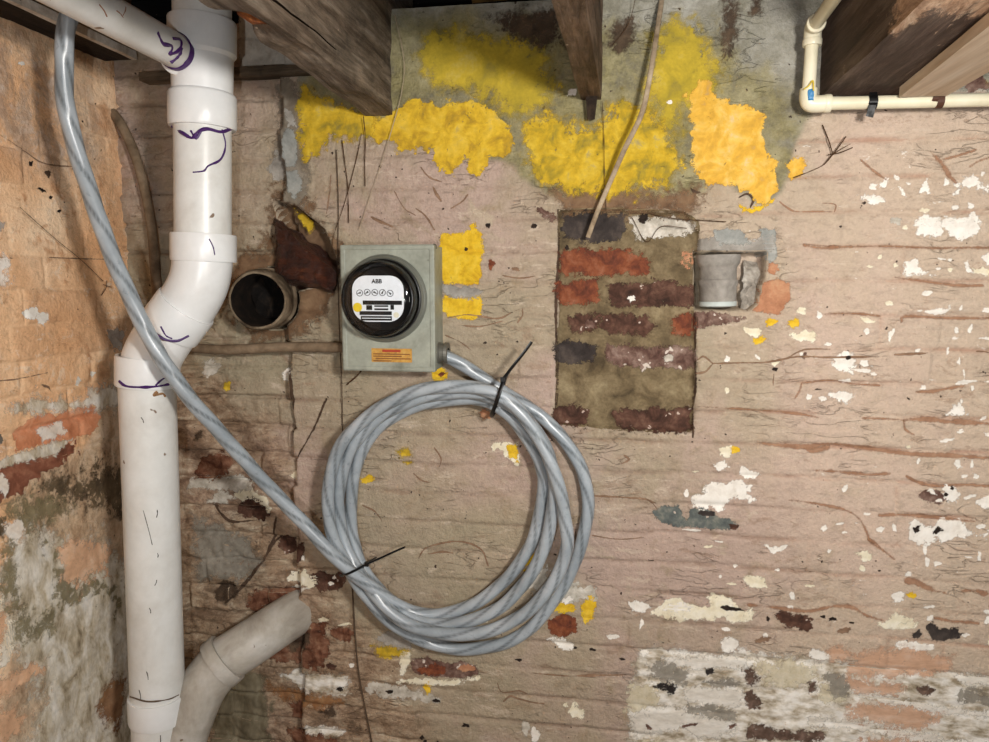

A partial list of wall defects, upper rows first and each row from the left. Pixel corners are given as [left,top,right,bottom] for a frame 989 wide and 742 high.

spalling [294,13,877,435]
peeling [889,172,989,241]
damp [8,378,170,416]
spalling [187,449,272,522]
peeling [652,445,760,548]
peeling [919,460,989,509]
damp [0,453,131,742]
spalling [215,535,346,612]
peeling [876,516,989,567]
spalling [270,617,354,674]
spalling [362,631,481,704]
peeling [622,564,989,742]